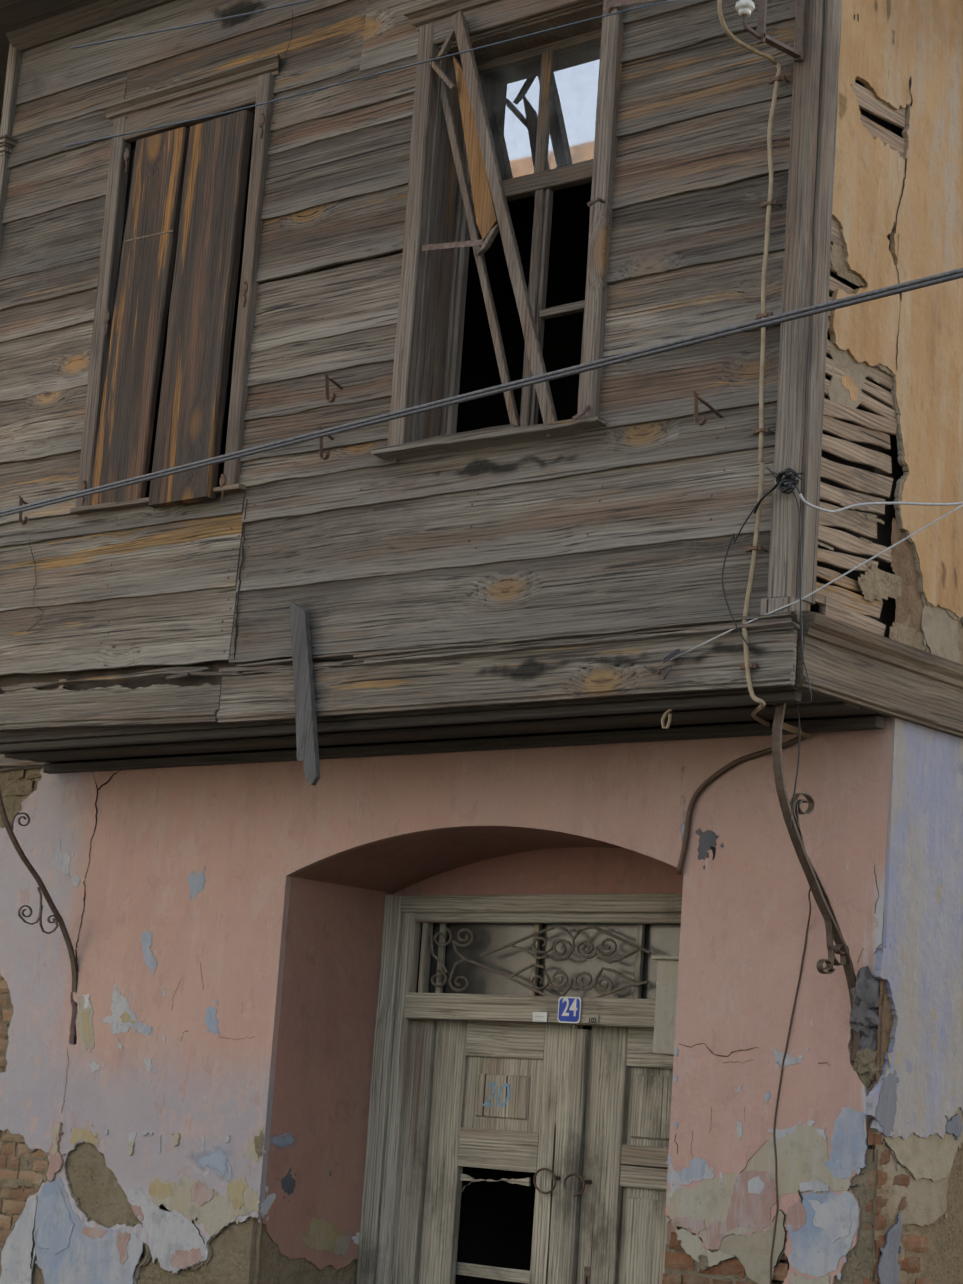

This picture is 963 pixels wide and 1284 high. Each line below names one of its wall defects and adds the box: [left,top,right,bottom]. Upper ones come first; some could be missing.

crack [894,158,907,364]
flaking render [810,217,963,664]
flaking render [0,766,44,828]
peeling [187,866,206,902]
peeling [139,930,166,996]
flaking render [0,974,14,1073]
peeling [74,983,166,1079]
peeling [204,1000,220,1035]
peeling [662,966,963,1284]
peeling [0,1122,357,1284]